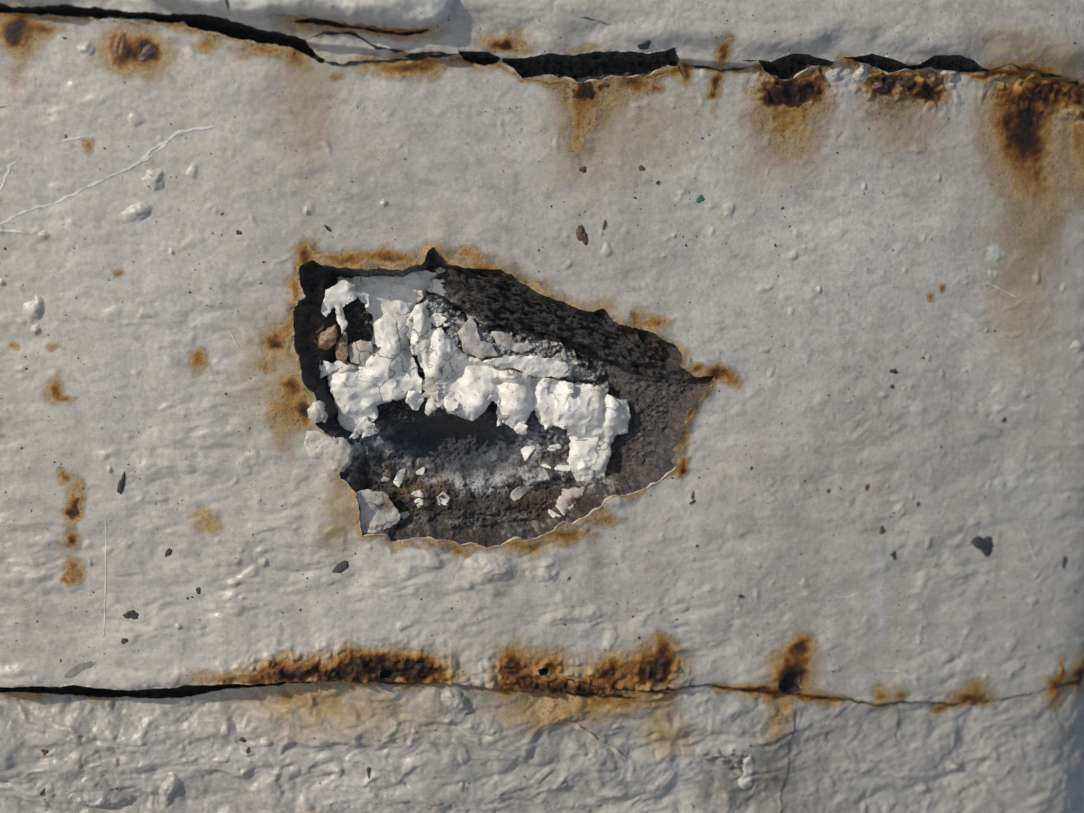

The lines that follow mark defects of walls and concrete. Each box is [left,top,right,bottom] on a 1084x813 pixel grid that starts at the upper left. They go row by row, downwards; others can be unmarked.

rust [0,13,99,71]
crack [0,0,1082,86]
rust [360,31,1084,244]
rust [258,239,742,478]
spalling [293,247,714,549]
rust [57,467,86,585]
crack [0,680,425,699]
rust [190,643,464,689]
rust [482,631,685,730]
crack [522,676,758,699]
rust [714,631,847,735]
crack [780,674,1083,813]